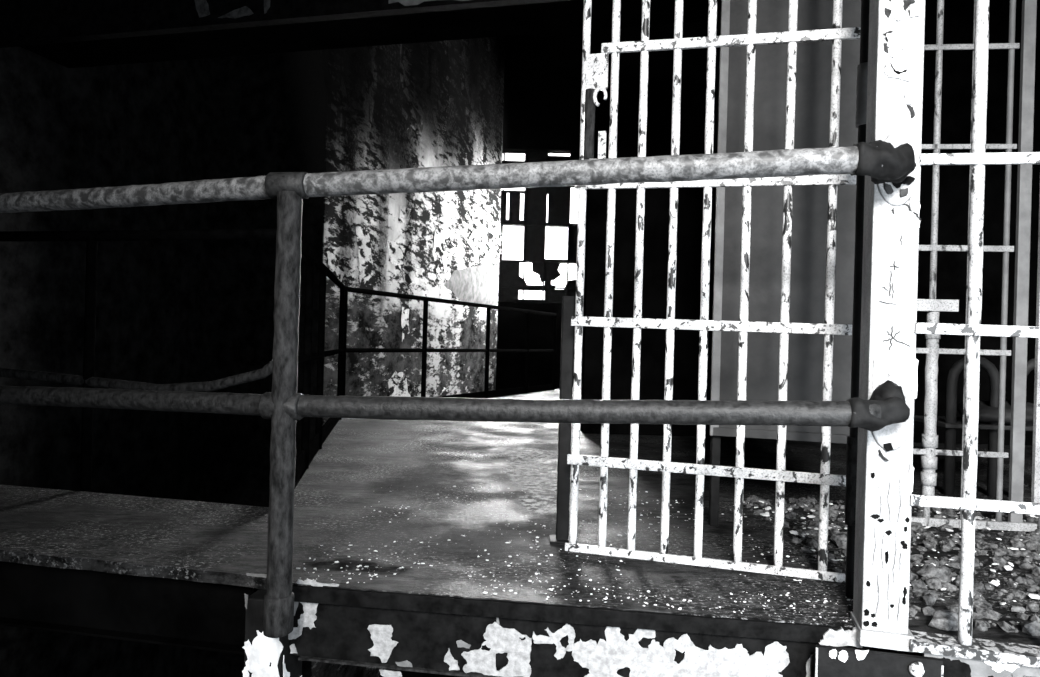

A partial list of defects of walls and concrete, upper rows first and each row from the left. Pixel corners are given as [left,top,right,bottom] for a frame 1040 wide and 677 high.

peeling [883,0,921,118]
peeling [870,514,910,549]
peeling [297,579,339,587]
peeling [242,602,319,677]
peeling [367,624,412,677]
peeling [444,618,790,677]
peeling [806,609,878,677]
peeling [941,657,971,677]
peeling [984,661,1020,677]